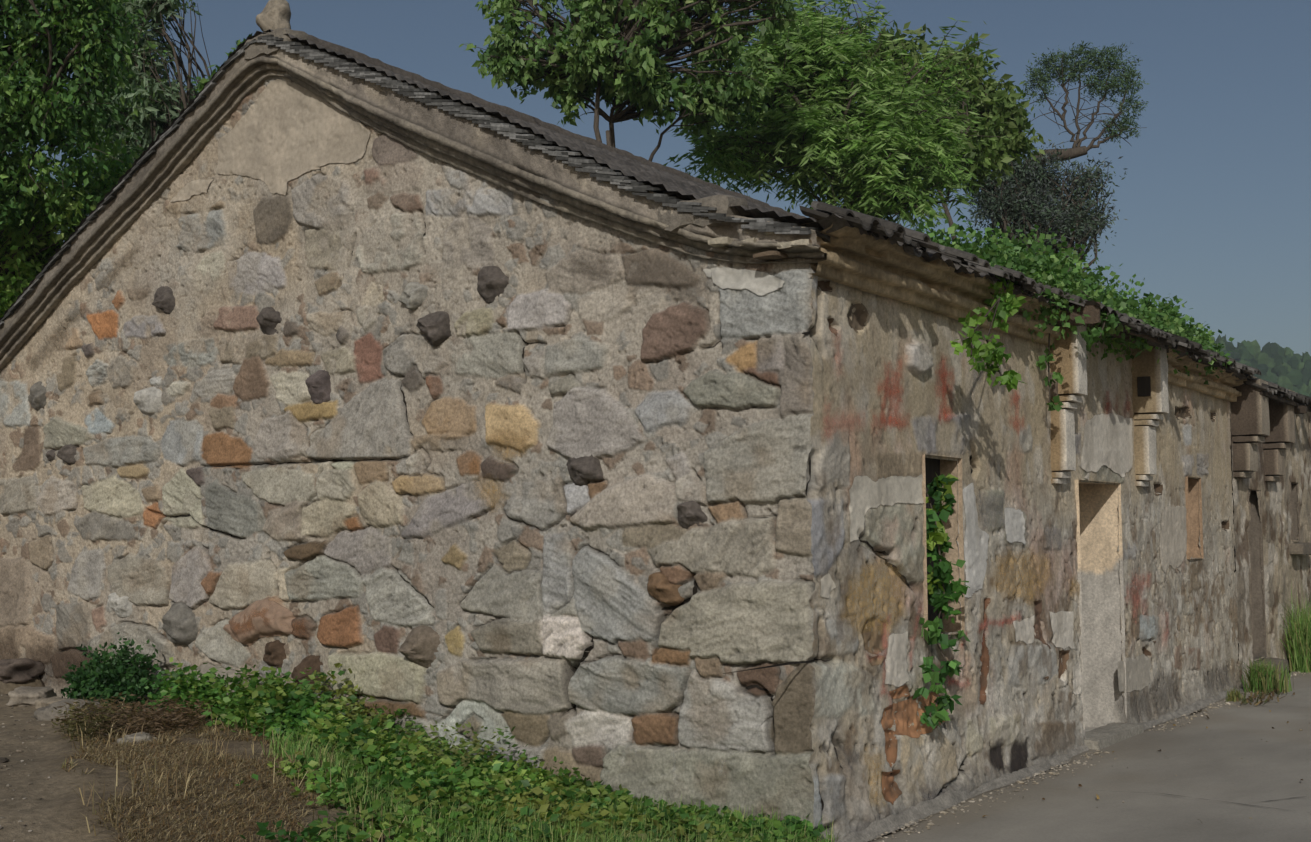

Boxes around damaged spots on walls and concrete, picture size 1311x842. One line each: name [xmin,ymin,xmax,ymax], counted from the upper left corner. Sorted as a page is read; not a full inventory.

peeling [849,474,924,542]
peeling [1004,507,1026,546]
peeling [820,573,836,598]
peeling [963,483,991,705]
peeling [1013,600,1082,695]
spalling [861,618,948,805]